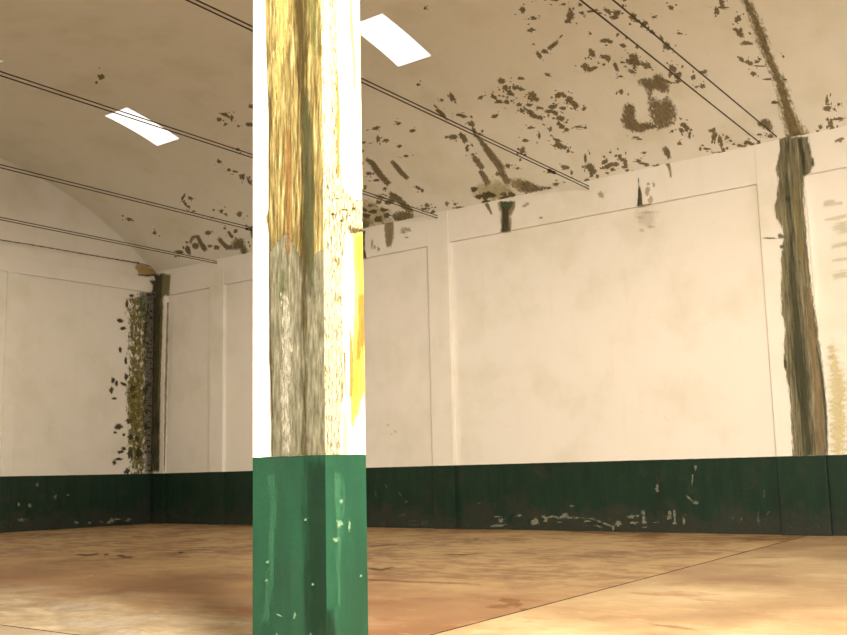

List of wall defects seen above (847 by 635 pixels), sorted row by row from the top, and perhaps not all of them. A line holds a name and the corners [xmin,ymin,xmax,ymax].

peeling [544,0,676,53]
peeling [710,0,762,45]
peeling [575,31,707,89]
peeling [362,126,436,213]
water stain [434,105,551,232]
peeling [478,77,587,161]
peeling [582,148,659,181]
peeling [633,117,694,145]
peeling [699,127,774,153]
peeling [816,93,844,132]
water stain [744,0,844,456]
water stain [265,0,413,635]